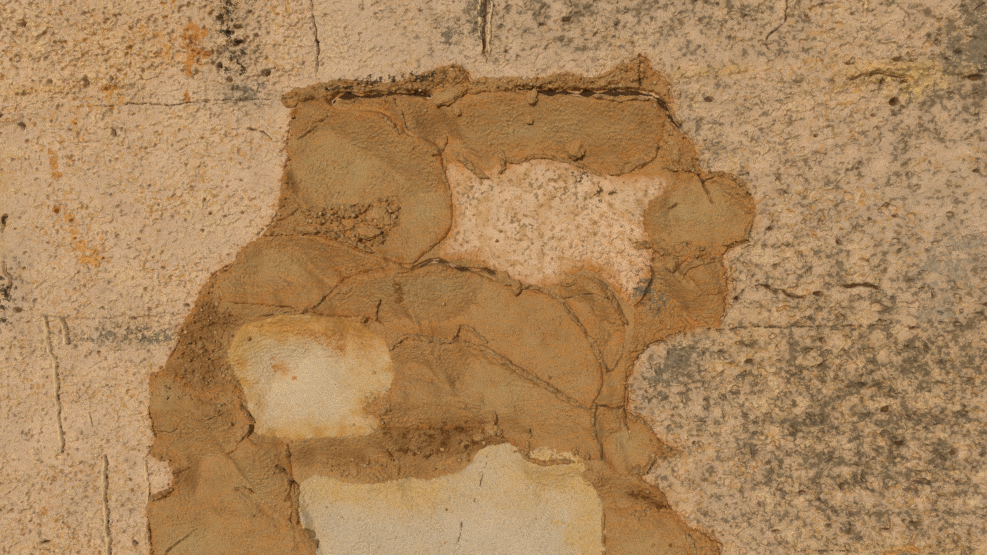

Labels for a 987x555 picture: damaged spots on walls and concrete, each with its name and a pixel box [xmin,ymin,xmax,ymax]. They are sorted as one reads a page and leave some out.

crack [480,0,488,57]
crack [766,0,812,49]
flaking render [438,157,669,306]